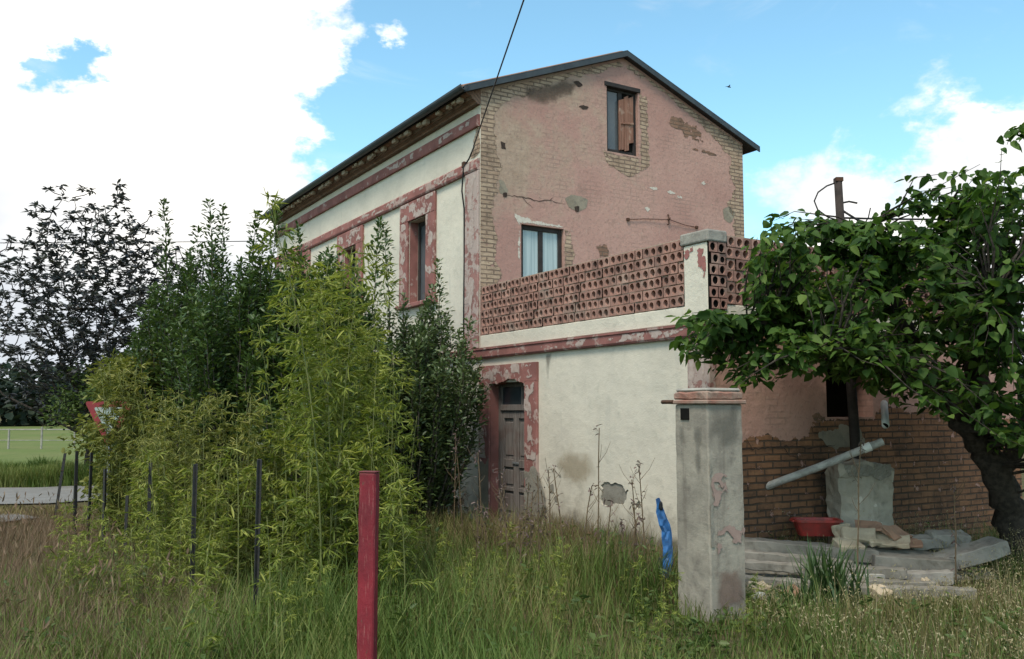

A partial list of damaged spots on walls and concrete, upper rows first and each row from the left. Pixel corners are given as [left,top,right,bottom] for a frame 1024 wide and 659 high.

damp [528,82,574,101]
flaking render [338,61,745,318]
peeling [609,327,685,342]
flaking render [480,363,561,525]
flaking render [602,482,641,509]
flaking render [710,406,998,555]